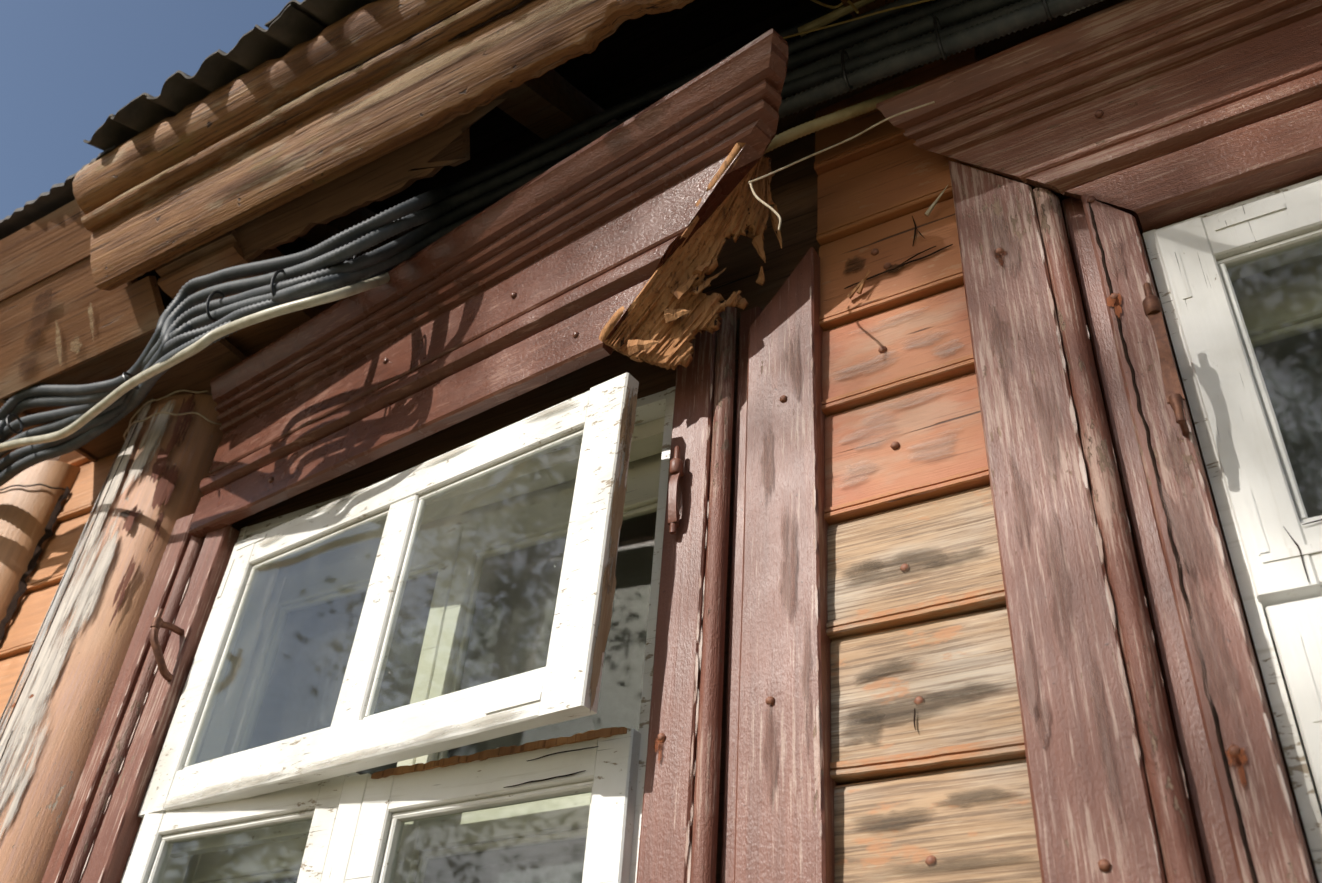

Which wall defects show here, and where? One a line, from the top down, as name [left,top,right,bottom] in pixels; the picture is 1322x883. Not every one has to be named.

peeling [1046,280,1066,372]
rust [1106,293,1122,318]
peeling [1069,396,1088,489]
peeling [1162,421,1236,697]
peeling [0,394,195,837]
peeling [690,575,705,778]
peeling [801,584,820,747]
peeling [1090,508,1140,766]
peeling [1233,599,1246,642]
peeling [1250,662,1272,740]
peeling [1277,764,1293,818]
peeling [685,805,693,883]